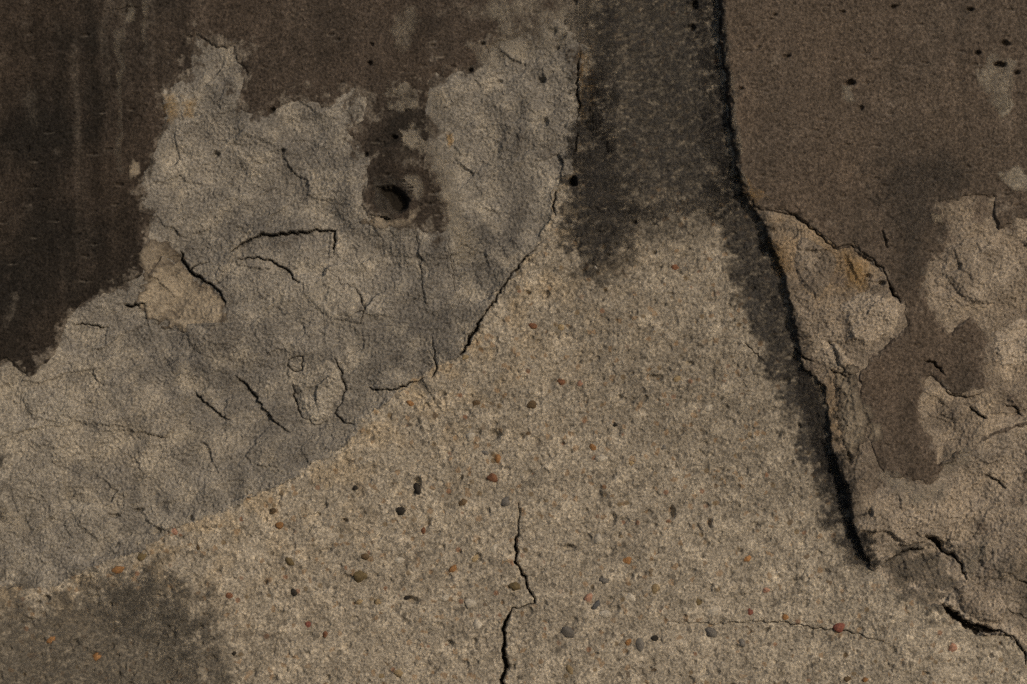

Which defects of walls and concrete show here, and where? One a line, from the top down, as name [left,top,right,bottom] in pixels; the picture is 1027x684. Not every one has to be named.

crack [180,228,365,324]
spalling [0,18,588,589]
crack [460,244,539,355]
water stain [561,0,880,566]
crack [236,336,437,431]
spalling [742,194,1027,655]
crack [500,503,535,684]
crack [885,537,967,580]
crack [942,604,1026,664]